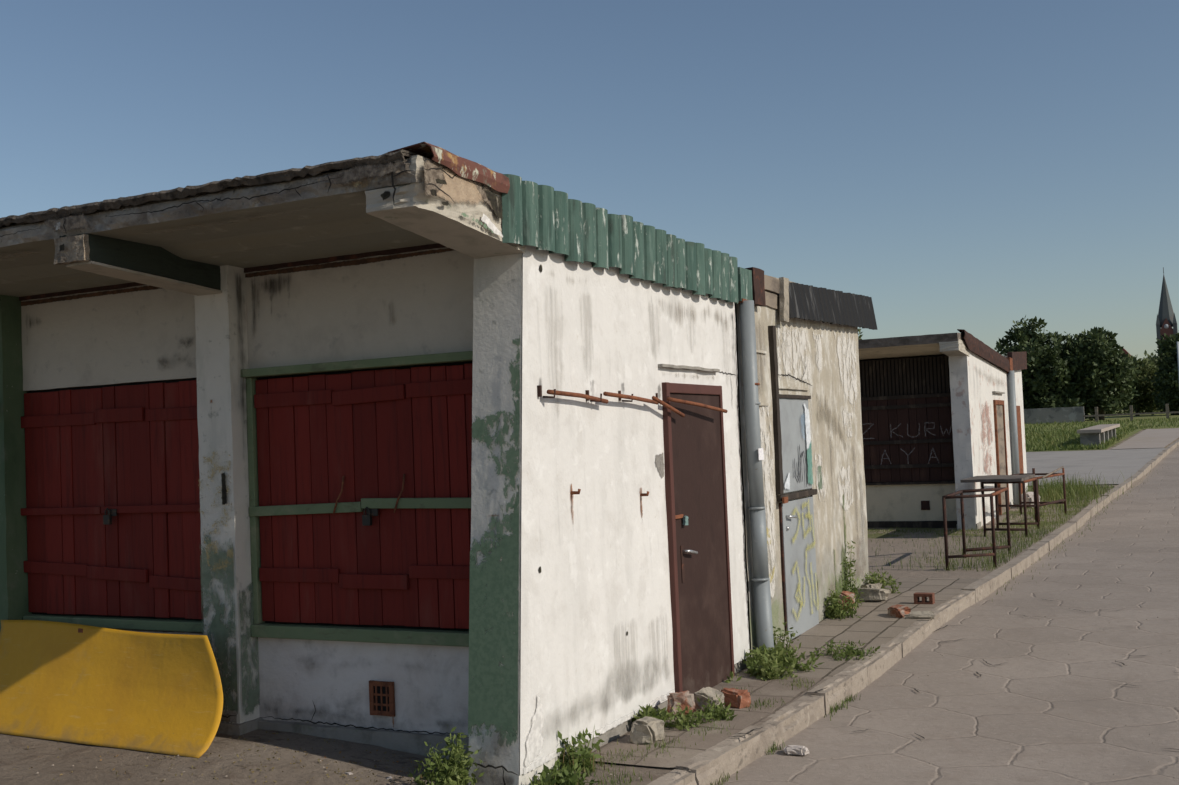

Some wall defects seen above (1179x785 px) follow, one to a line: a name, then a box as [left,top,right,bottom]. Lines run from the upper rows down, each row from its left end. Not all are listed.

crack [391,162,414,202]
peeling [200,453,260,723]
peeling [468,336,520,747]
peeling [777,326,859,510]